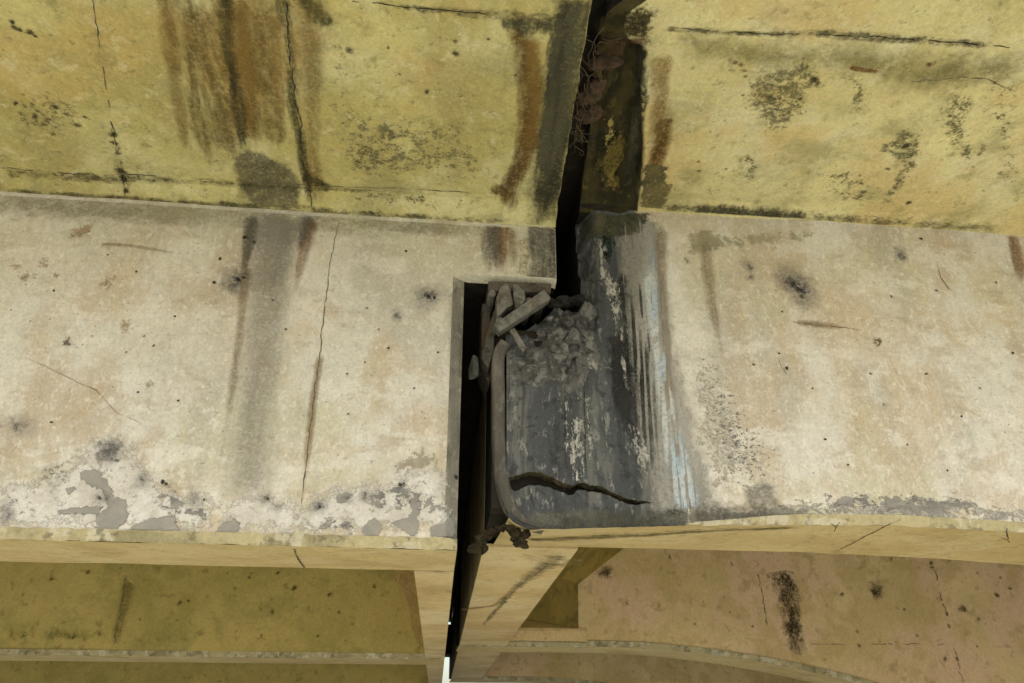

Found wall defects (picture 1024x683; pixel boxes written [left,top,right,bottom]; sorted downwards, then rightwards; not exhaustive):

leakage [0,0,480,438]
crack [8,0,498,196]
rust [492,29,542,206]
rust [637,59,672,209]
crack [301,221,339,503]
spalling [506,310,601,482]
peeling [597,239,634,396]
leakage [530,213,804,541]
peeling [0,435,458,538]
crack [503,472,691,515]
peeling [795,491,1024,521]
mould [768,571,802,653]